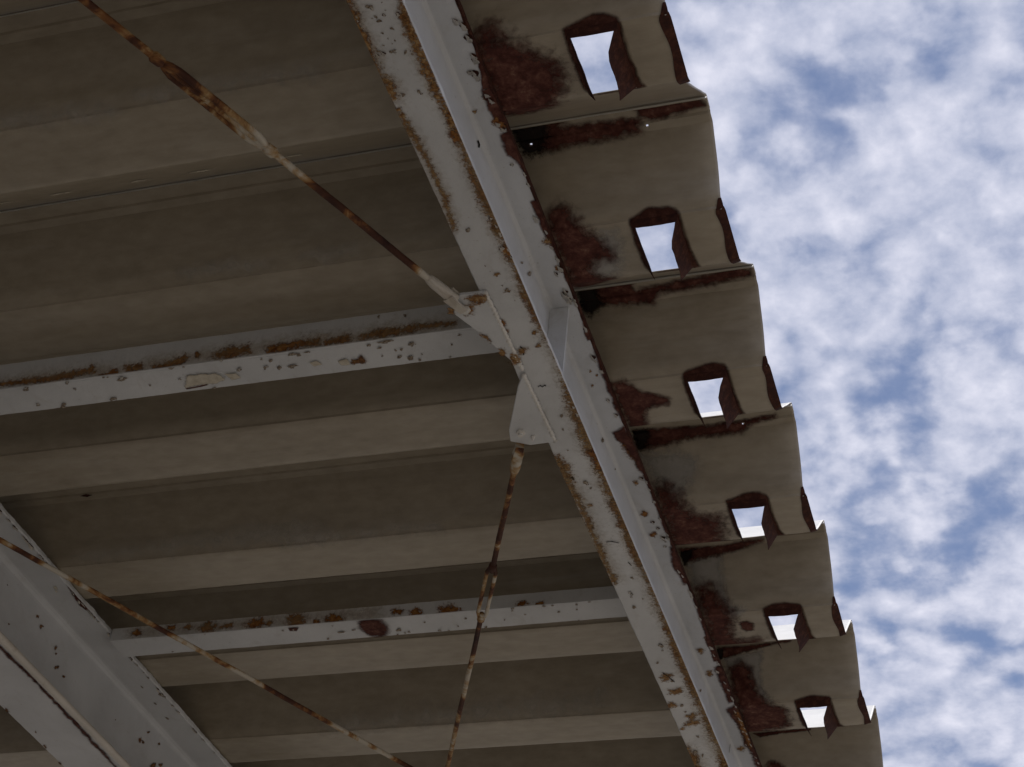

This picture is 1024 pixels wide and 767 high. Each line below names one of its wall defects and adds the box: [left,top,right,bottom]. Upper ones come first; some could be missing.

corrosion [346,0,458,231]
corrosion [265,295,487,353]
corrosion [0,341,252,386]
corrosion [398,0,728,767]
corrosion [530,200,843,767]
corrosion [167,617,273,633]
corrosion [286,613,343,626]
corrosion [358,607,423,638]